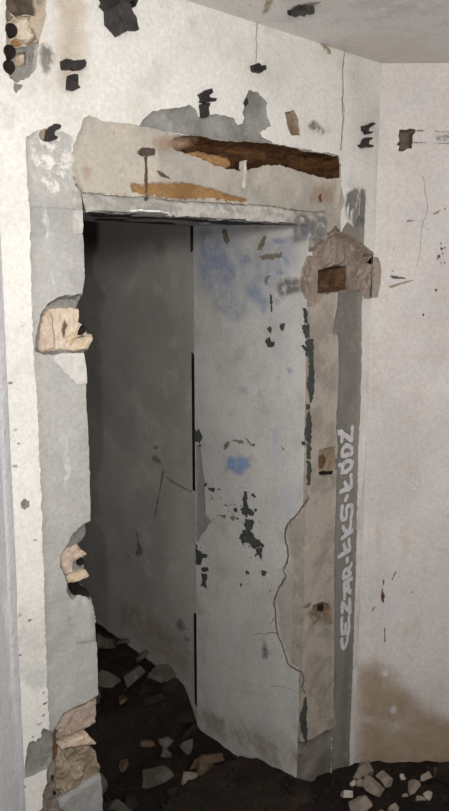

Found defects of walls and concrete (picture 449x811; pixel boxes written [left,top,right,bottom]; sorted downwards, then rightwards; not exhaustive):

rust [131,147,246,205]
spalling [397,129,415,151]
spalling [25,90,381,811]
crack [253,496,335,695]
leakage [362,669,449,763]
spalling [340,761,433,811]